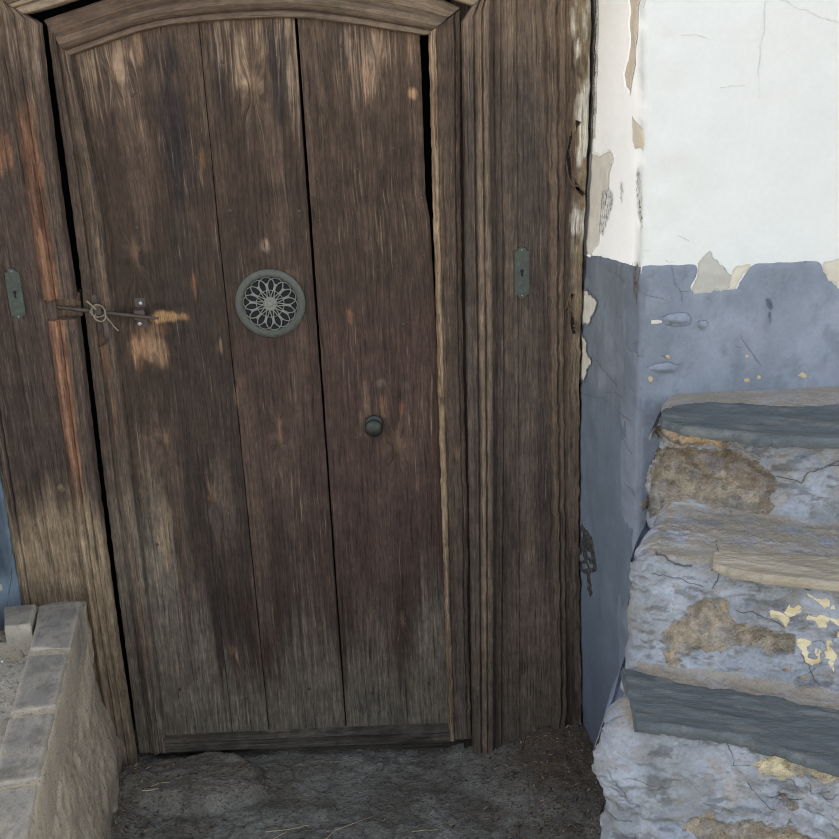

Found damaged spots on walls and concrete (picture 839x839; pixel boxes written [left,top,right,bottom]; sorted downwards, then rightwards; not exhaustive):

peeling [623,0,646,94]
crack [758,0,839,97]
peeling [632,117,644,150]
peeling [566,120,614,257]
peeling [691,251,751,294]
peeling [822,258,839,289]
spalling [640,421,780,517]
spalling [659,593,839,672]
spalling [751,756,839,785]
spalling [682,791,812,839]